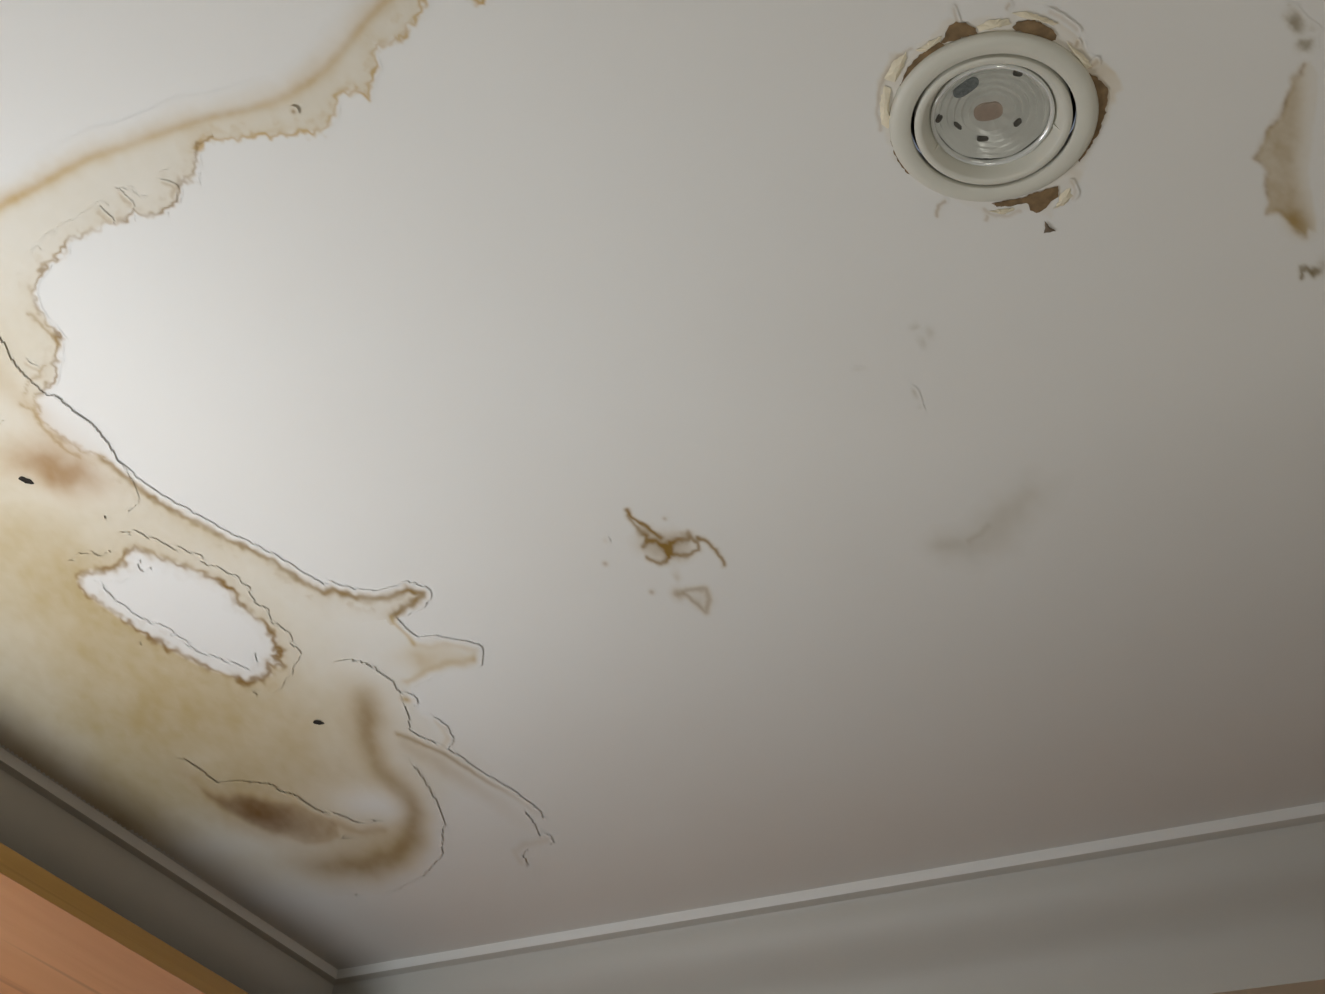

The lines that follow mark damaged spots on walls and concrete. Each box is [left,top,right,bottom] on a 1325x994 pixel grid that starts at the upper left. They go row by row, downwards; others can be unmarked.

peeling [872,0,1127,233]
damp [1247,1,1325,284]
damp [0,0,553,903]
damp [599,505,729,618]